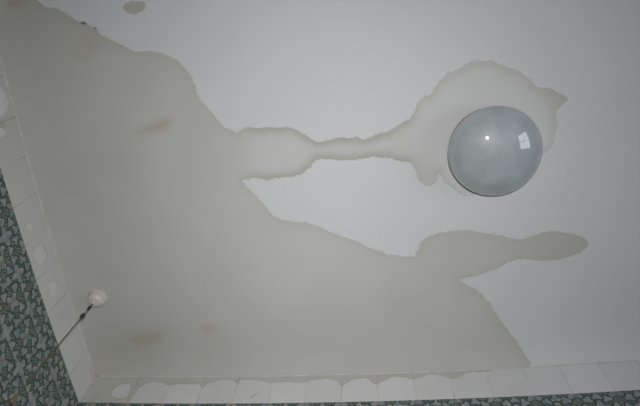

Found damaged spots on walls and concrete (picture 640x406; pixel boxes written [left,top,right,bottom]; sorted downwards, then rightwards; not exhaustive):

damp [0,0,530,376]
damp [412,60,567,195]
damp [415,230,588,280]